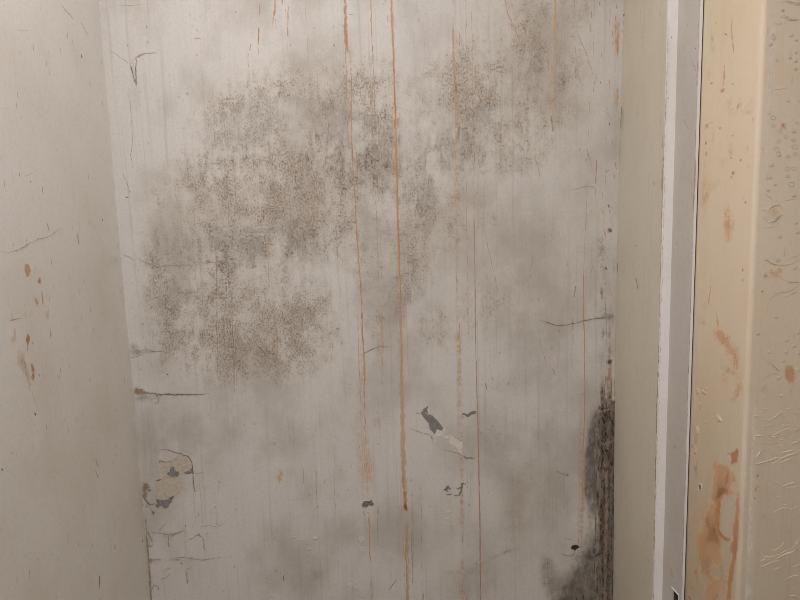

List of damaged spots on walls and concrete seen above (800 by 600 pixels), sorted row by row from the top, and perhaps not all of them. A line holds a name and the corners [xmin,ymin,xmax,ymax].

crack [126,45,150,84]
mould [425,0,548,171]
mould [145,64,404,384]
corrosion [353,175,366,424]
corrosion [387,0,407,511]
mould [392,169,466,319]
crack [135,374,203,402]
spalling [142,449,203,515]
spalling [412,401,477,459]
leakage [548,349,615,600]
corrosion [694,448,738,600]